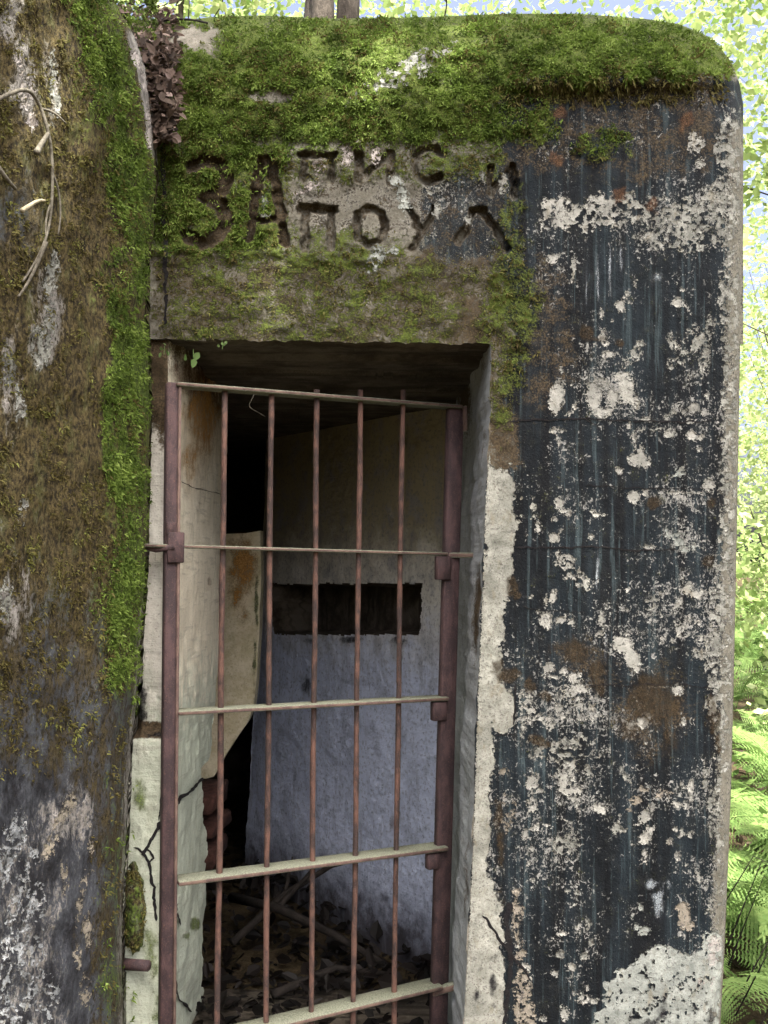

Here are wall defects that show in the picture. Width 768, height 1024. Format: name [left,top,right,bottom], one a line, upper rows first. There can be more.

peeling [423,186,442,220]
flaking render [464,91,742,1024]
damp [493,660,550,701]
crack [133,778,203,926]